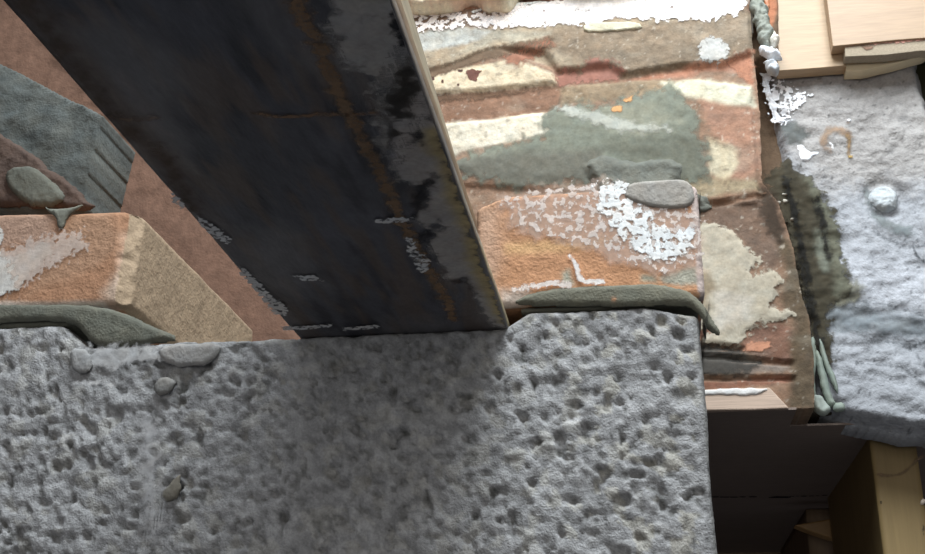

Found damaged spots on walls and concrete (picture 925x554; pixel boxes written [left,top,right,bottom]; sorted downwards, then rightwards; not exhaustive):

efflorescence [0,226,89,296]
efflorescence [511,254,605,292]
efflorescence [500,178,705,274]
damp [760,186,783,242]
damp [781,175,924,360]